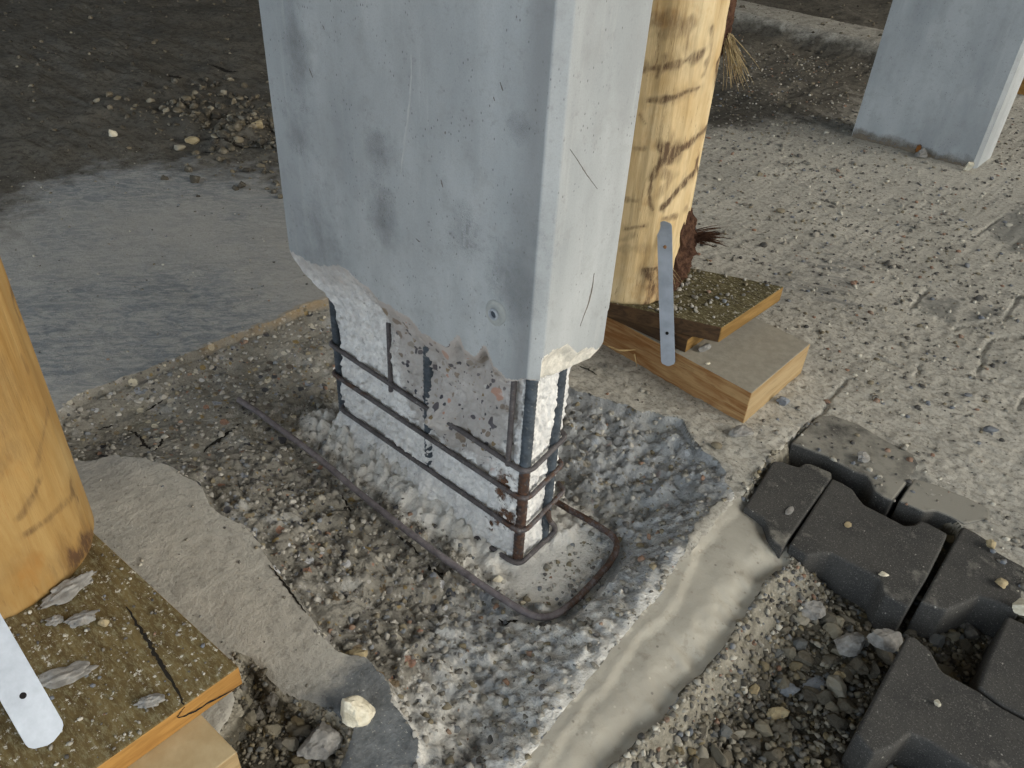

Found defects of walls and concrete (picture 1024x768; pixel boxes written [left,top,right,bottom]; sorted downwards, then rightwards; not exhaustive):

crack [204,423,241,452]
spalling [57,251,734,768]
rust [486,469,517,531]